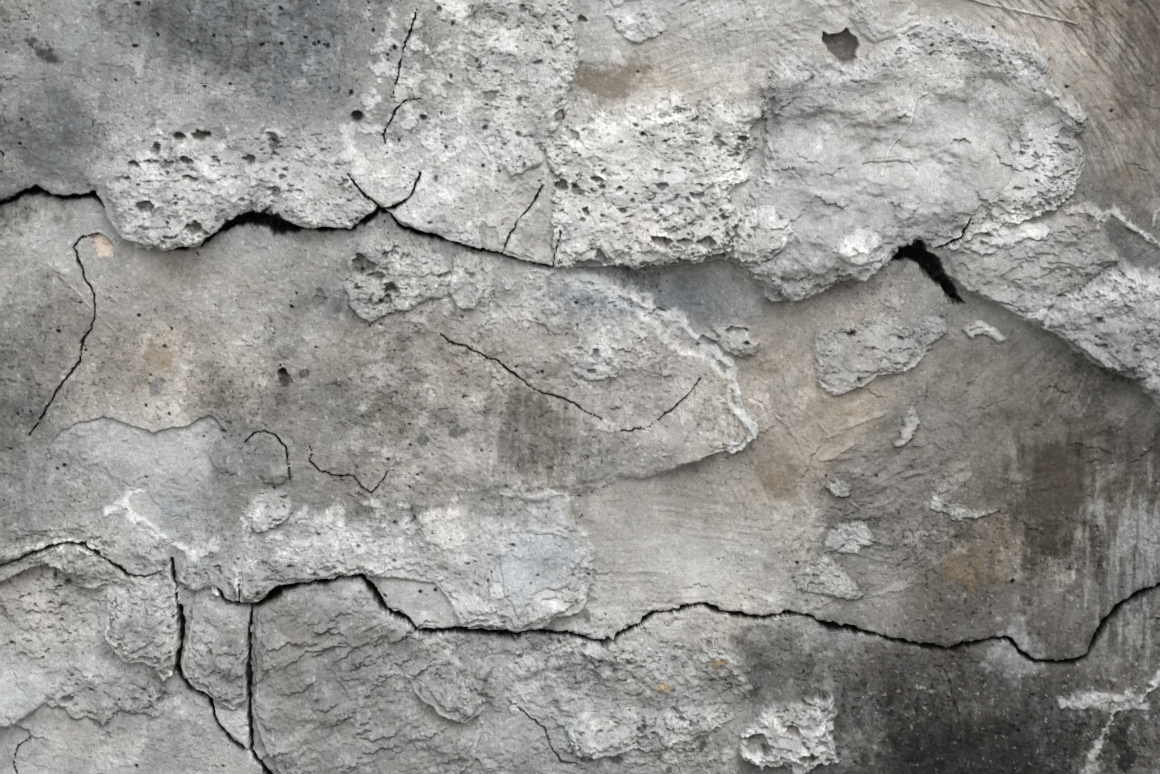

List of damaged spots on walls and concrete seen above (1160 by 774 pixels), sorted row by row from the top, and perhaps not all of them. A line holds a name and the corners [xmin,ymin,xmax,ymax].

crack [0,184,105,437]
peeling [105,114,483,251]
crack [165,173,562,270]
crack [439,333,703,434]
peeling [465,0,1160,413]
crack [891,217,973,305]
spalling [0,415,227,730]
peeling [179,237,761,774]
crack [0,541,1160,774]
peeling [740,691,839,774]
spalling [792,394,998,613]
damp [1111,501,1160,587]